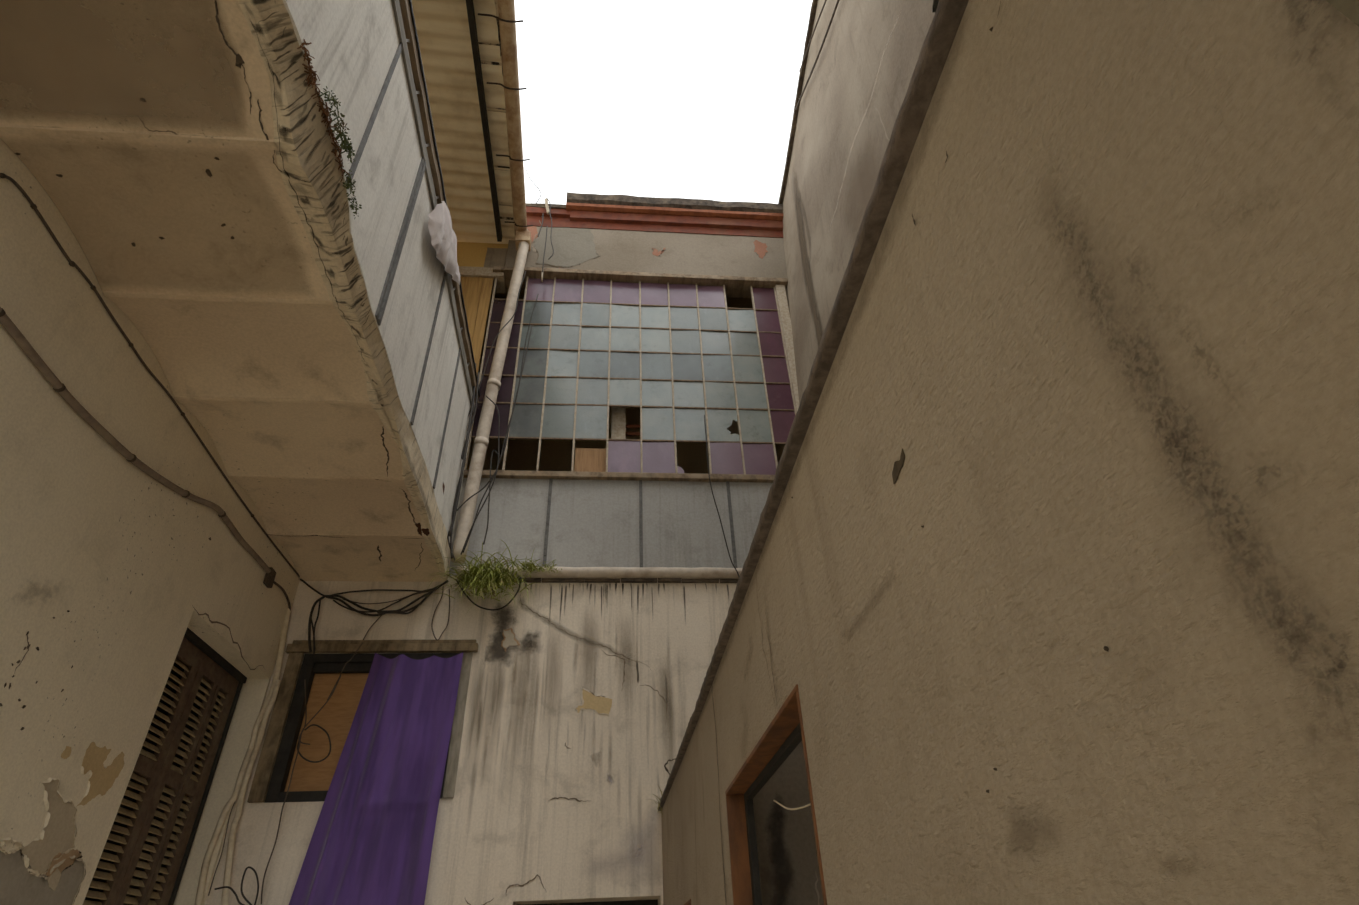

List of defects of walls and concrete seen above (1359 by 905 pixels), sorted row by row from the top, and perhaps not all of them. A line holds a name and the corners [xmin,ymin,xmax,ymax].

crack [214,0,282,172]
crack [375,427,424,569]
water stain [488,583,665,681]
peeling [575,688,612,716]
peeling [0,742,124,905]
crack [465,874,546,905]